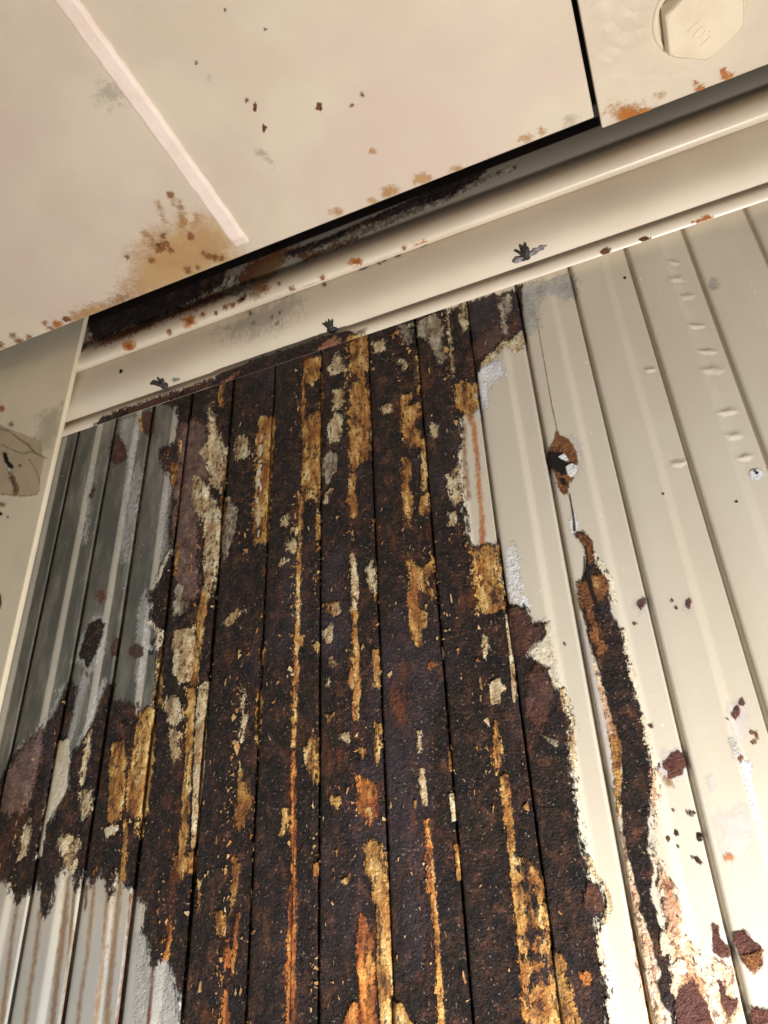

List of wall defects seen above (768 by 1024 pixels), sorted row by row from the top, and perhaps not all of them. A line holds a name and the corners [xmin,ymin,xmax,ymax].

rust [611,104,652,120]
rust [44,164,517,351]
peeling [0,425,43,496]
peeling [503,540,531,611]
rust [0,284,615,1024]
peeling [527,640,558,670]
rust [574,531,768,1024]